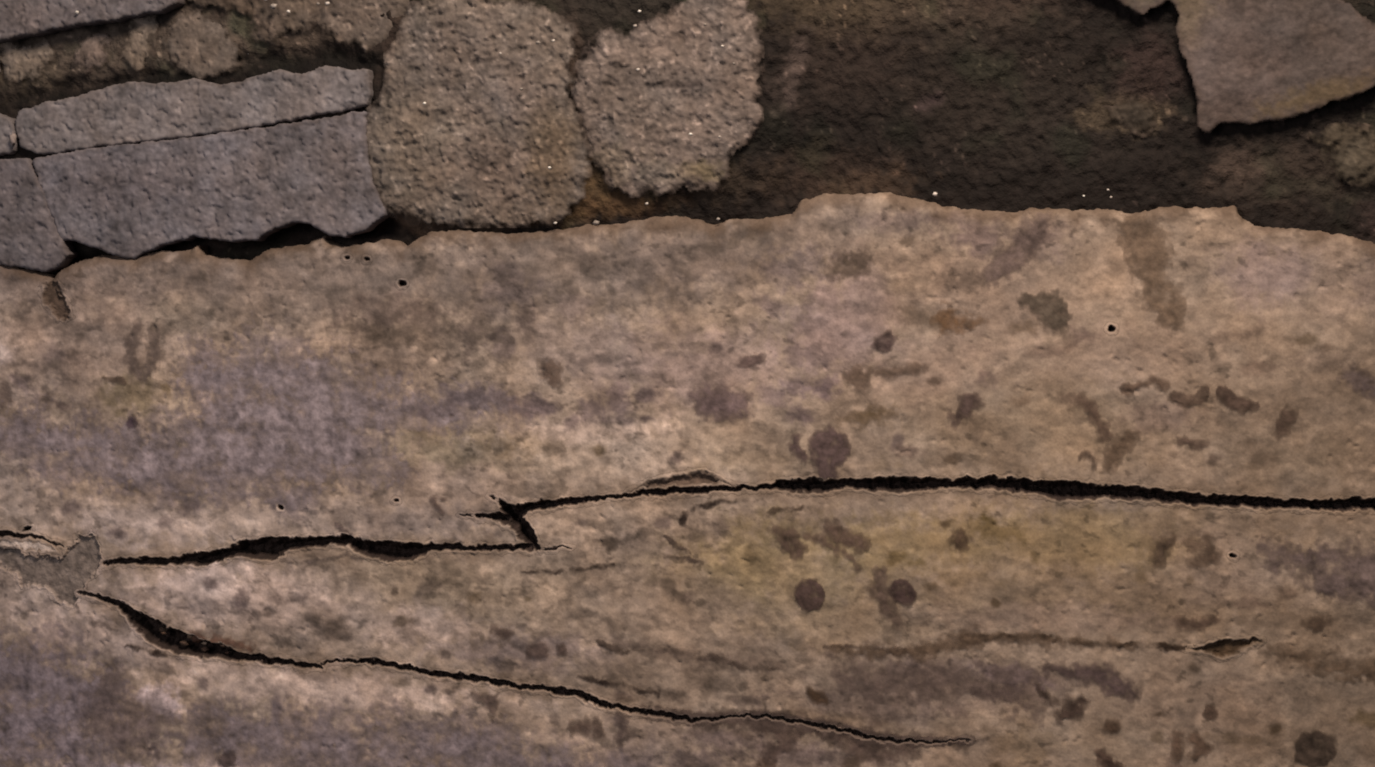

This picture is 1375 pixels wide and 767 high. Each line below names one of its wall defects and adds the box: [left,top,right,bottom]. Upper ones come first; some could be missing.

spalling [340,253,373,265]
spalling [394,277,410,290]
crack [0,523,67,551]
crack [74,471,1375,748]